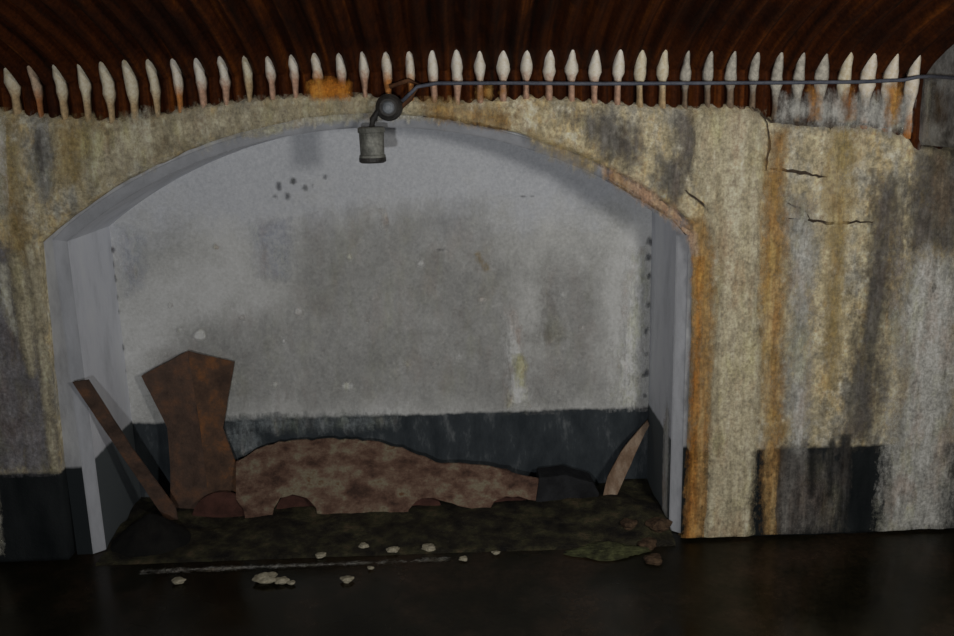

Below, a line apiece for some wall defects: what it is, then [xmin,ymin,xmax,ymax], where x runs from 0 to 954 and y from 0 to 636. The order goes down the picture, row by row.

water stain [0,120,58,472]
water stain [584,114,643,165]
rust [686,218,713,538]
rust [758,130,788,535]
crack [752,107,885,178]
crack [788,203,873,225]
water stain [775,153,954,534]